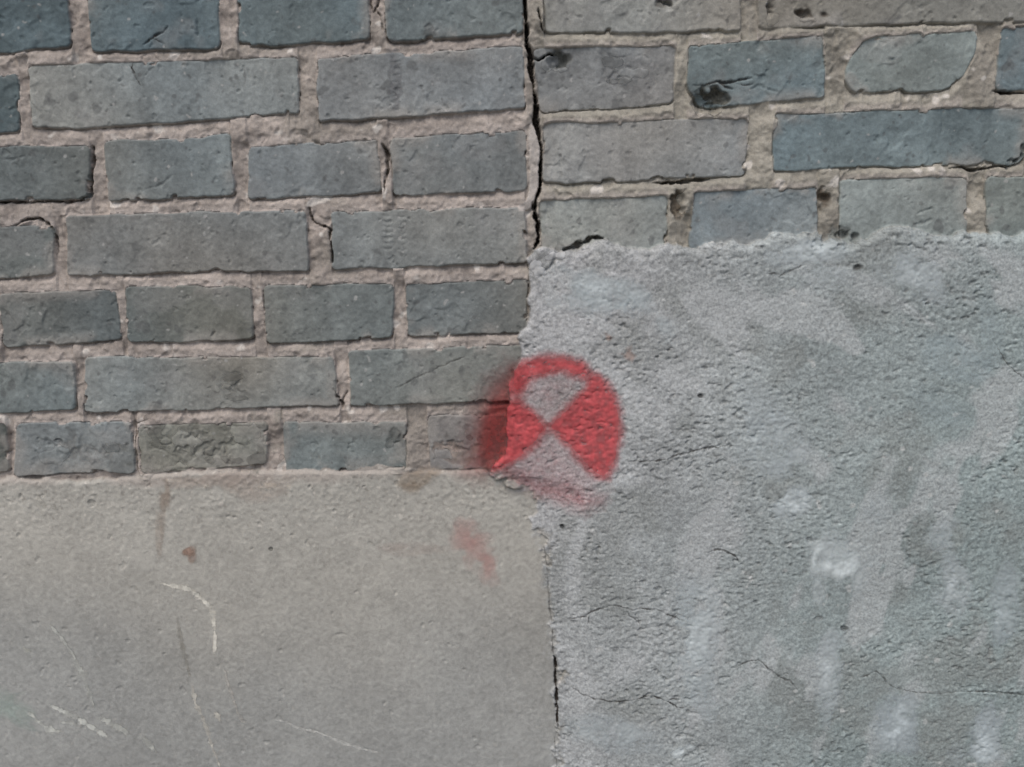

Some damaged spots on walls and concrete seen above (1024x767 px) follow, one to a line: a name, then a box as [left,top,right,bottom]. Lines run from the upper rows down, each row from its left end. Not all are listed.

crack [523,0,553,246]
crack [554,657,682,725]